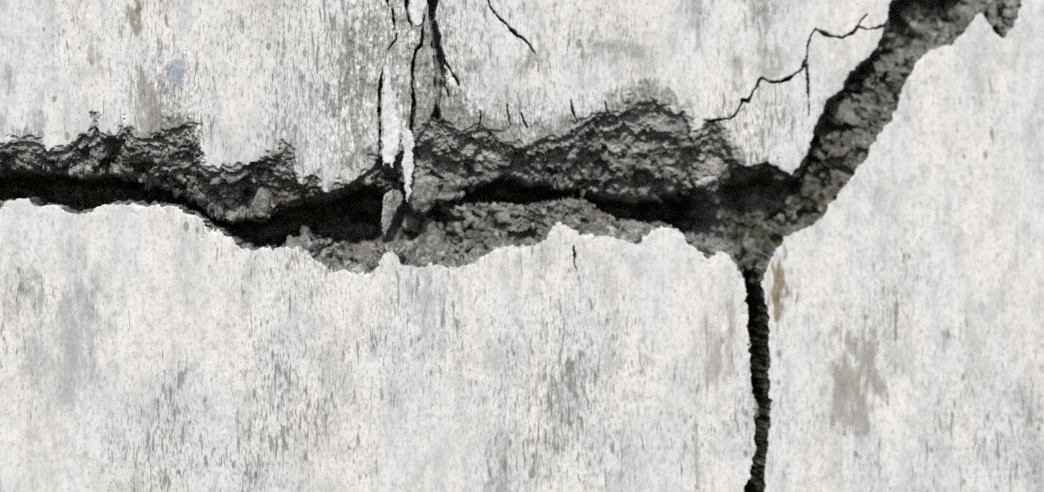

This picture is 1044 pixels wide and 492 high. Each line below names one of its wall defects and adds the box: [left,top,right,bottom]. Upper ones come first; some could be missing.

spalling [0,125,338,222]
crack [376,71,384,157]
crack [385,0,460,136]
crack [487,0,539,73]
crack [506,104,528,128]
spalling [280,58,791,274]
crack [570,100,578,124]
crack [704,13,883,125]
crack [767,0,1022,237]
crack [0,169,790,492]